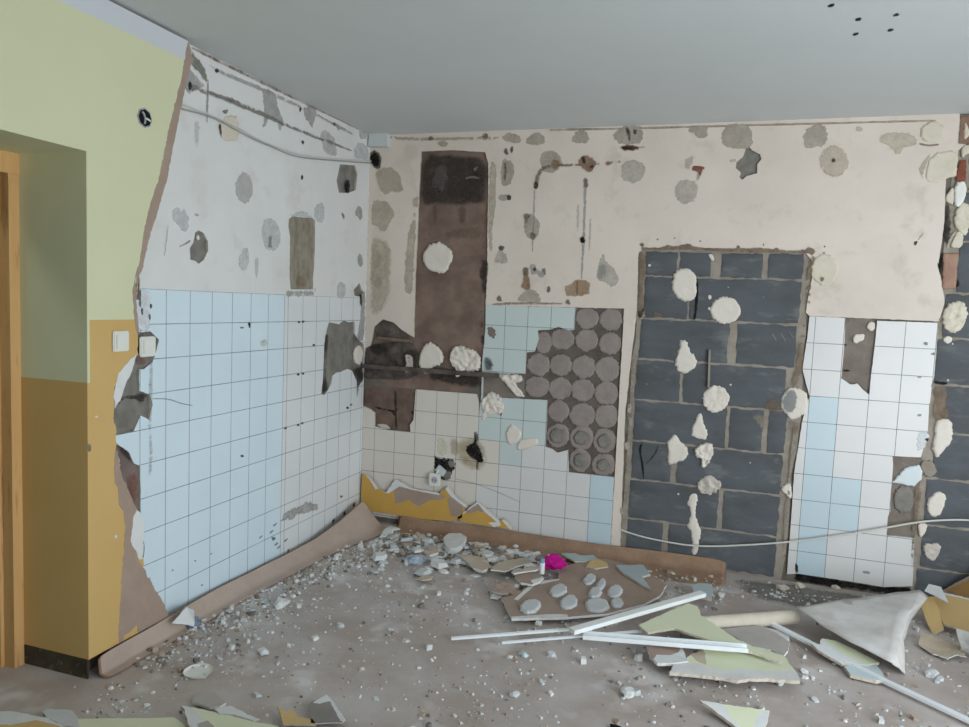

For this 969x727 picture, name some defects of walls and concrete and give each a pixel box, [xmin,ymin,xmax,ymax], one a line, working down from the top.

peeling [132,42,209,339]
flaking render [235,172,253,204]
peeling [262,203,324,297]
spalling [299,106,381,193]
flaking render [498,133,545,201]
flaking render [597,255,619,287]
peeling [636,237,825,319]
flaking render [938,123,969,289]
peeling [313,282,418,432]
peeling [480,264,635,476]
peeling [842,318,877,391]
peeling [113,354,168,643]